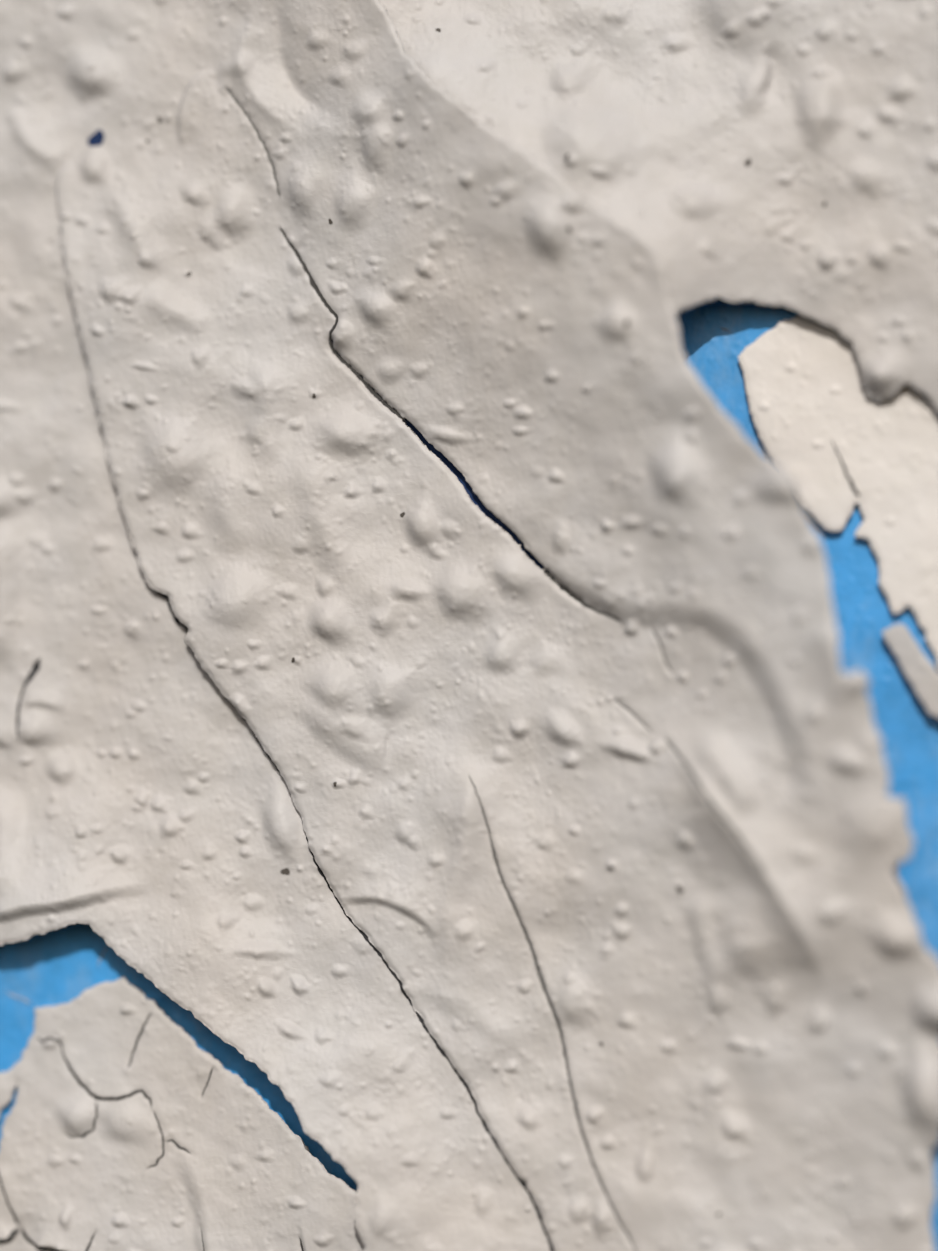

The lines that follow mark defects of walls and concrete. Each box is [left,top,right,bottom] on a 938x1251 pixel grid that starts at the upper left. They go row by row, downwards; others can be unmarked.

crack [227,88,280,195]
crack [280,227,621,622]
crack [16,658,40,741]
crack [151,588,279,771]
peeling [678,298,938,958]
crack [37,1014,190,1168]
peeling [0,923,365,1251]
crack [306,836,554,1251]
crack [469,776,636,1251]